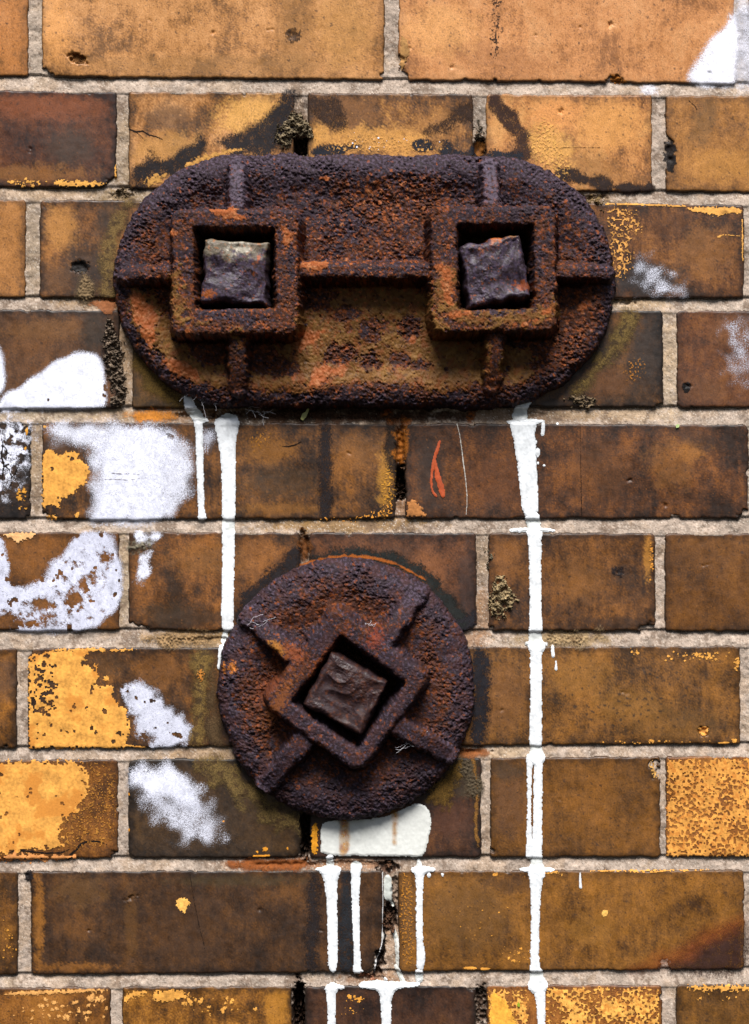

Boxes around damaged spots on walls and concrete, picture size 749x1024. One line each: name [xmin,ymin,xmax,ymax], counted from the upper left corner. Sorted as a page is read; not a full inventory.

rust [297,532,425,580]
peeling [27,647,146,750]